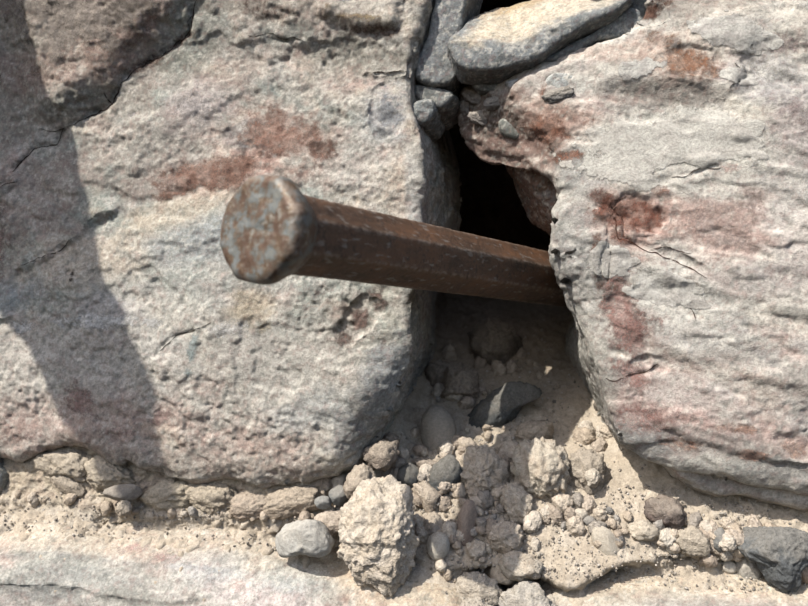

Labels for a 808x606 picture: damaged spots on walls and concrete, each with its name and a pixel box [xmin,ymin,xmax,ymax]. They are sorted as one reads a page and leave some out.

crack [0,0,197,188]
crack [597,196,706,278]